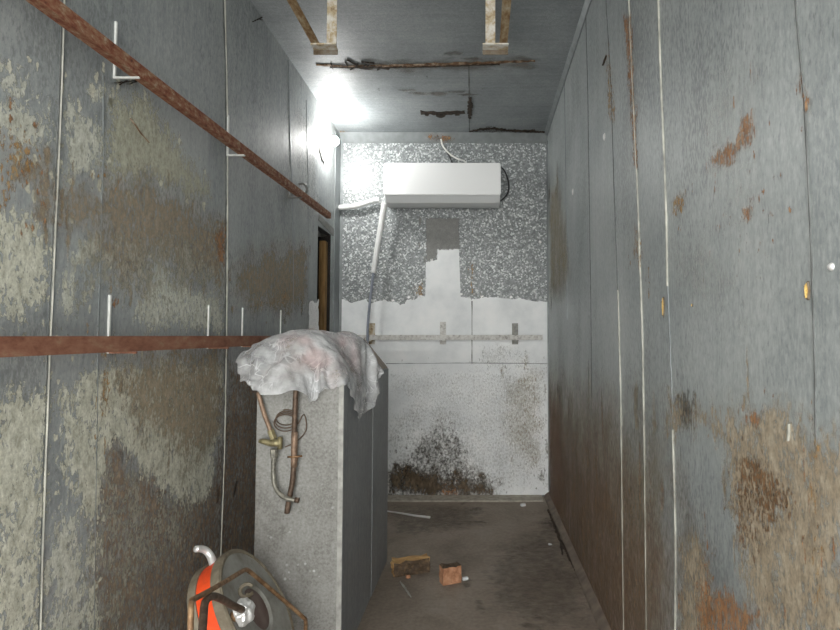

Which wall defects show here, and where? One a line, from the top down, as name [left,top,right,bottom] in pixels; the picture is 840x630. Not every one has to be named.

rust [0,97,43,209]
peeling [0,181,104,336]
peeling [0,56,212,212]
water stain [12,147,226,305]
rust [623,15,638,168]
rust [706,109,755,177]
peeling [341,249,549,495]
water stain [89,349,262,630]
water stain [388,422,493,495]
water stain [666,376,840,630]
rust [724,451,796,564]
rust [696,563,760,630]